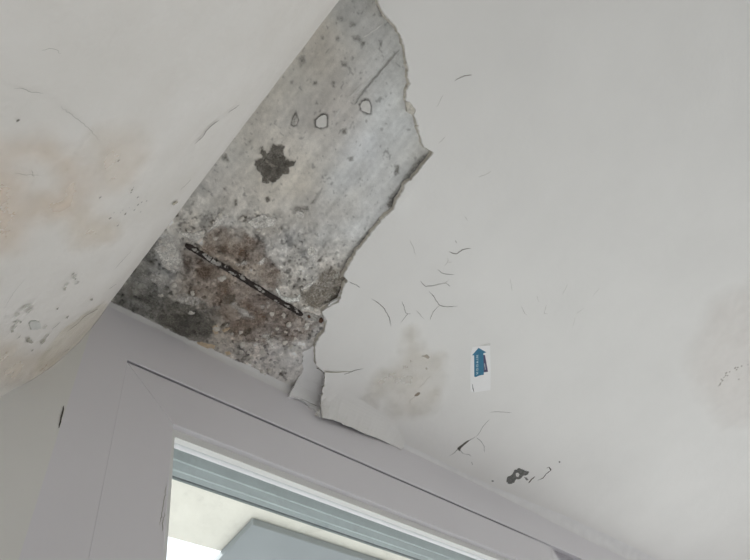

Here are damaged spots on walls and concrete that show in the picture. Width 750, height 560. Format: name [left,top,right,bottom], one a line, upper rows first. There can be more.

spalling [111,0,429,387]
leakage [138,273,210,337]
leakage [155,231,202,273]
rust [213,281,310,344]
crack [374,240,470,324]
crack [451,411,510,465]
peeling [506,468,529,484]